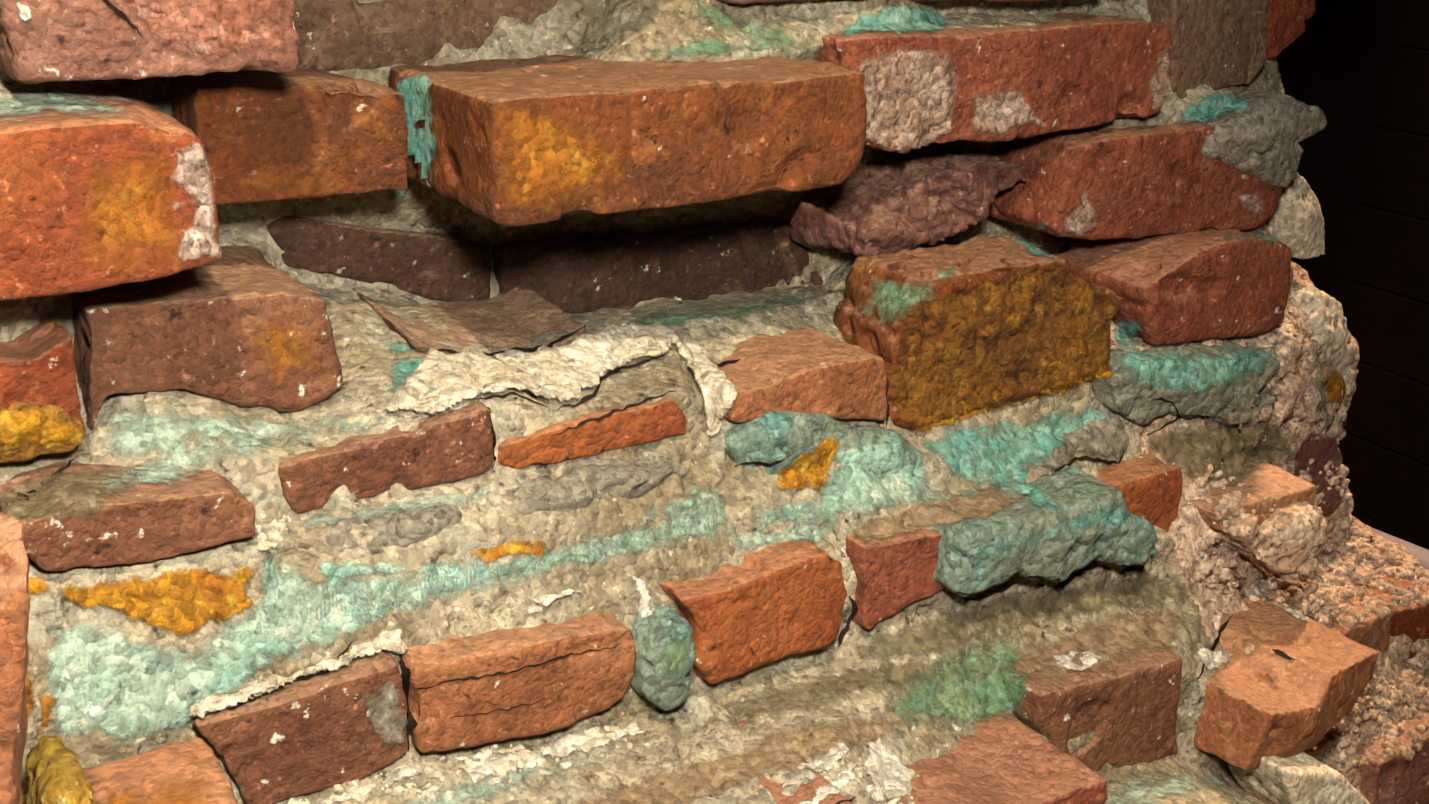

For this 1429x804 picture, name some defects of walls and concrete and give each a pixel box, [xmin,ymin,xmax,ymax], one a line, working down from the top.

crack [105,0,142,36]
peeling [384,320,737,437]
peeling [1209,388,1278,429]
peeling [1041,417,1129,470]